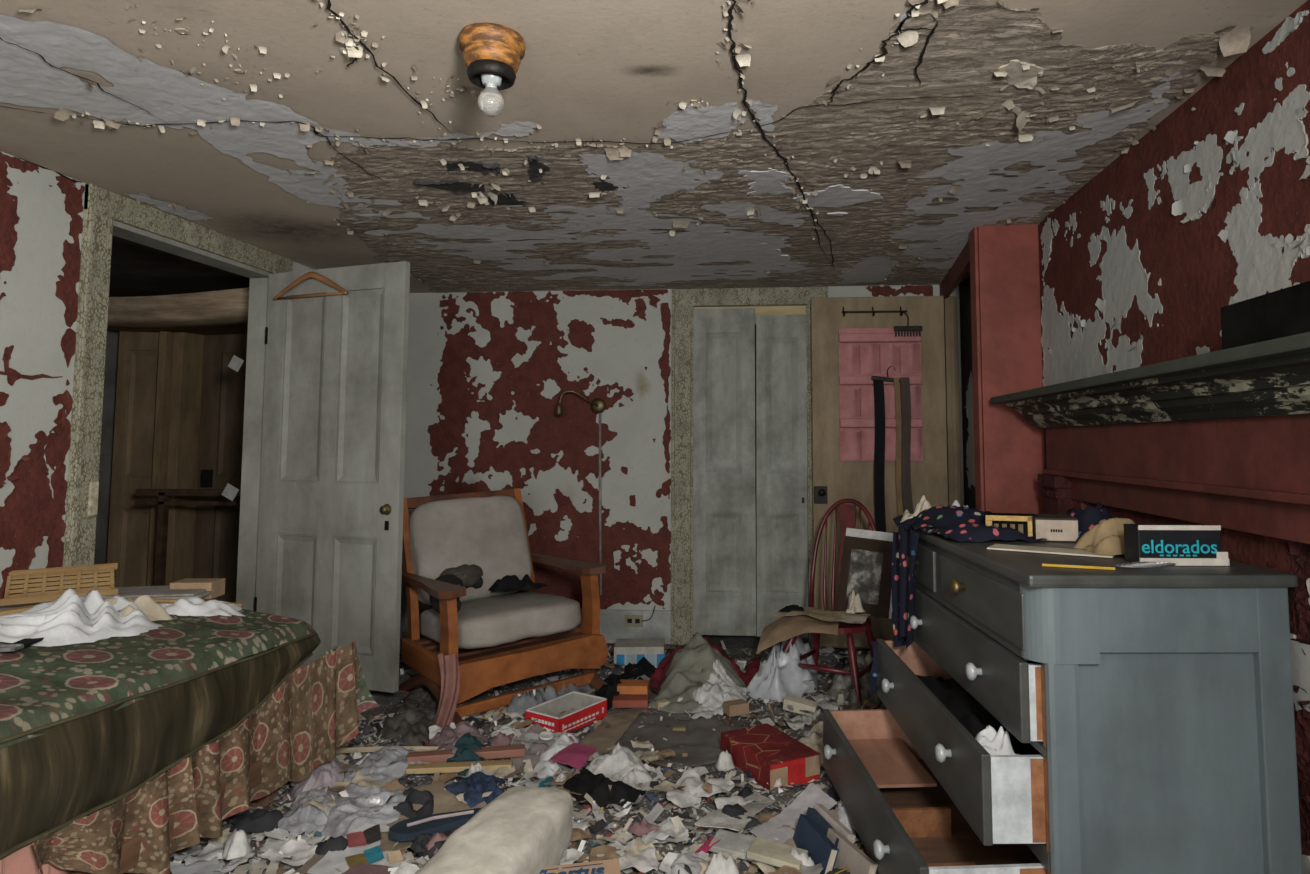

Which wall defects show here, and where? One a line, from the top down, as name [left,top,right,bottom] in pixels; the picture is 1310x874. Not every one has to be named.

crack [0,0,991,269]
peeling [0,0,1310,609]
peeling [1290,634,1310,712]
peeling [1302,855,1310,874]